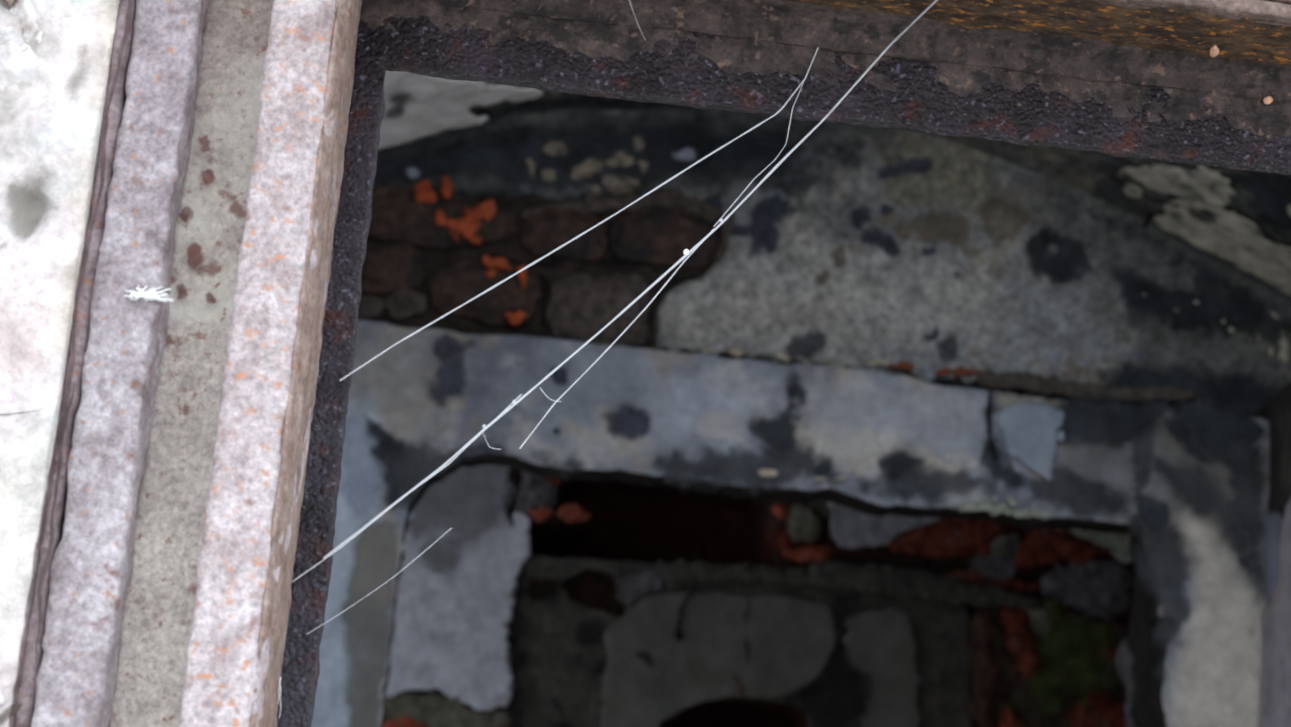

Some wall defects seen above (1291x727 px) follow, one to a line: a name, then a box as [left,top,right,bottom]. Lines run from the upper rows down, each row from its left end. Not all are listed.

corrosion [200,135,210,152]
corrosion [201,169,215,185]
corrosion [179,207,193,222]
corrosion [187,243,203,268]
corrosion [177,284,187,299]